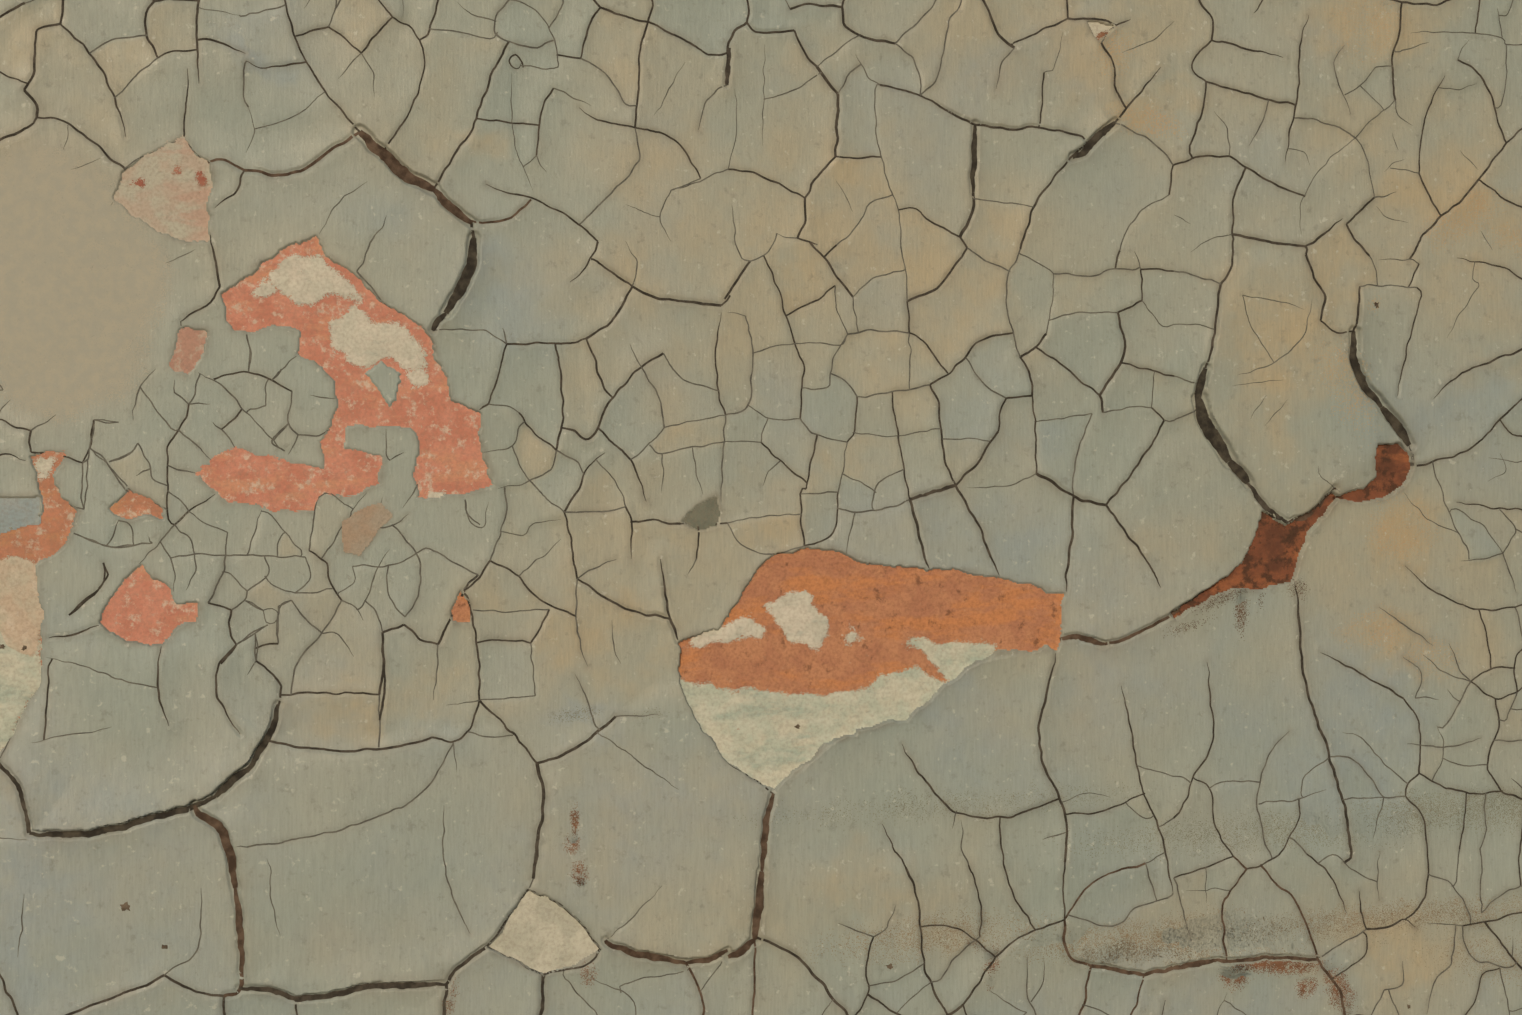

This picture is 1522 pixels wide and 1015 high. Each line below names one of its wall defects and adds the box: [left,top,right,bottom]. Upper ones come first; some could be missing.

peeling [114,135,213,242]
peeling [169,327,207,374]
peeling [196,236,492,556]
peeling [0,450,77,751]
peeling [100,565,198,645]
crack [0,0,941,1015]
peeling [678,548,1064,789]
peeling [1171,443,1410,618]
peeling [489,891,599,973]